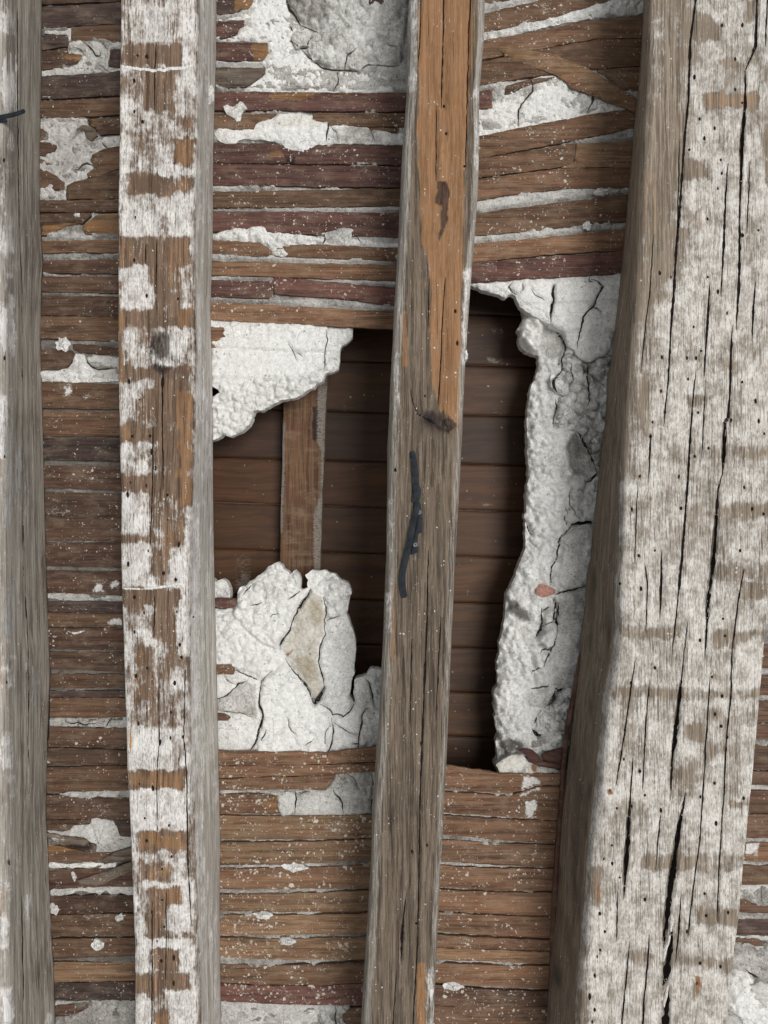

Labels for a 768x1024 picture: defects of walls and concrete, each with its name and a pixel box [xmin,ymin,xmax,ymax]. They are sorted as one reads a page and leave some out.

spalling [288,0,409,73]
crack [286,0,471,179]
crack [508,277,604,422]
crack [215,584,374,756]
spalling [495,687,572,774]
spalling [535,584,556,598]
crack [526,433,598,737]
crack [616,0,768,1024]